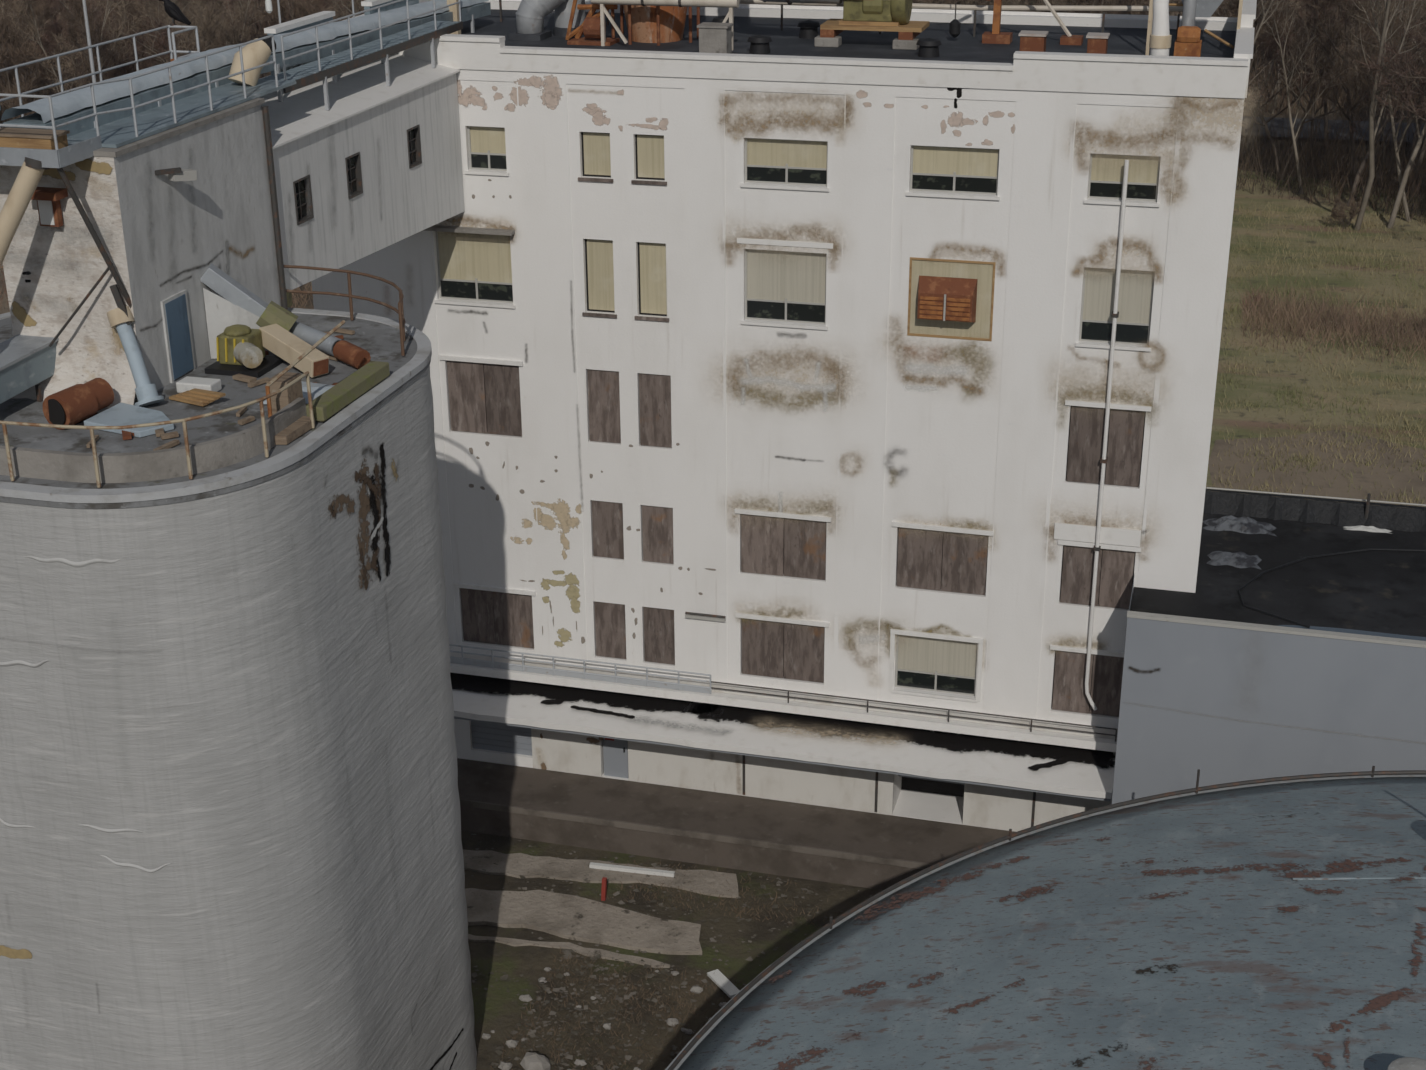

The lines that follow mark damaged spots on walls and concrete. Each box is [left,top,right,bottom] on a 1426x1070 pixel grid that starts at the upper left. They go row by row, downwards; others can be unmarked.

peeling [457,75,562,112]
leakage [724,101,850,132]
peeling [921,105,1015,146]
leakage [1088,96,1242,145]
leakage [905,345,984,393]
spalling [328,443,399,590]
peeling [510,489,585,647]
corrosion [999,883,1057,902]
corrosion [1120,857,1426,913]
corrosion [1136,964,1180,974]
corrosion [1312,907,1426,1069]
corrosion [1072,1042,1128,1067]